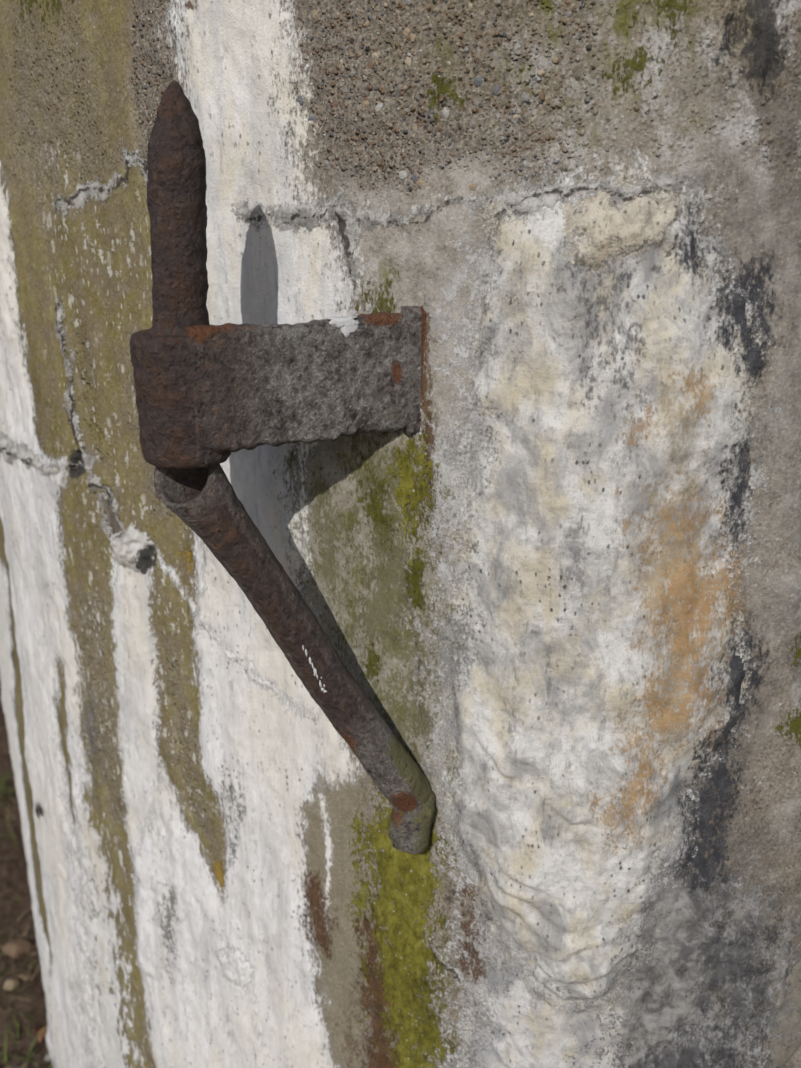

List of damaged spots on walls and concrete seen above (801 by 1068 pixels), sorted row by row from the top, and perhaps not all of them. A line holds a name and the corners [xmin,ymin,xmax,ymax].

spalling [703,0,797,98]
spalling [296,95,318,129]
spalling [413,97,450,132]
crack [46,139,148,221]
crack [0,297,125,543]
corrosion [421,307,435,508]
damp [396,155,801,1068]
corrosion [302,873,338,959]
corrosion [354,909,400,1068]